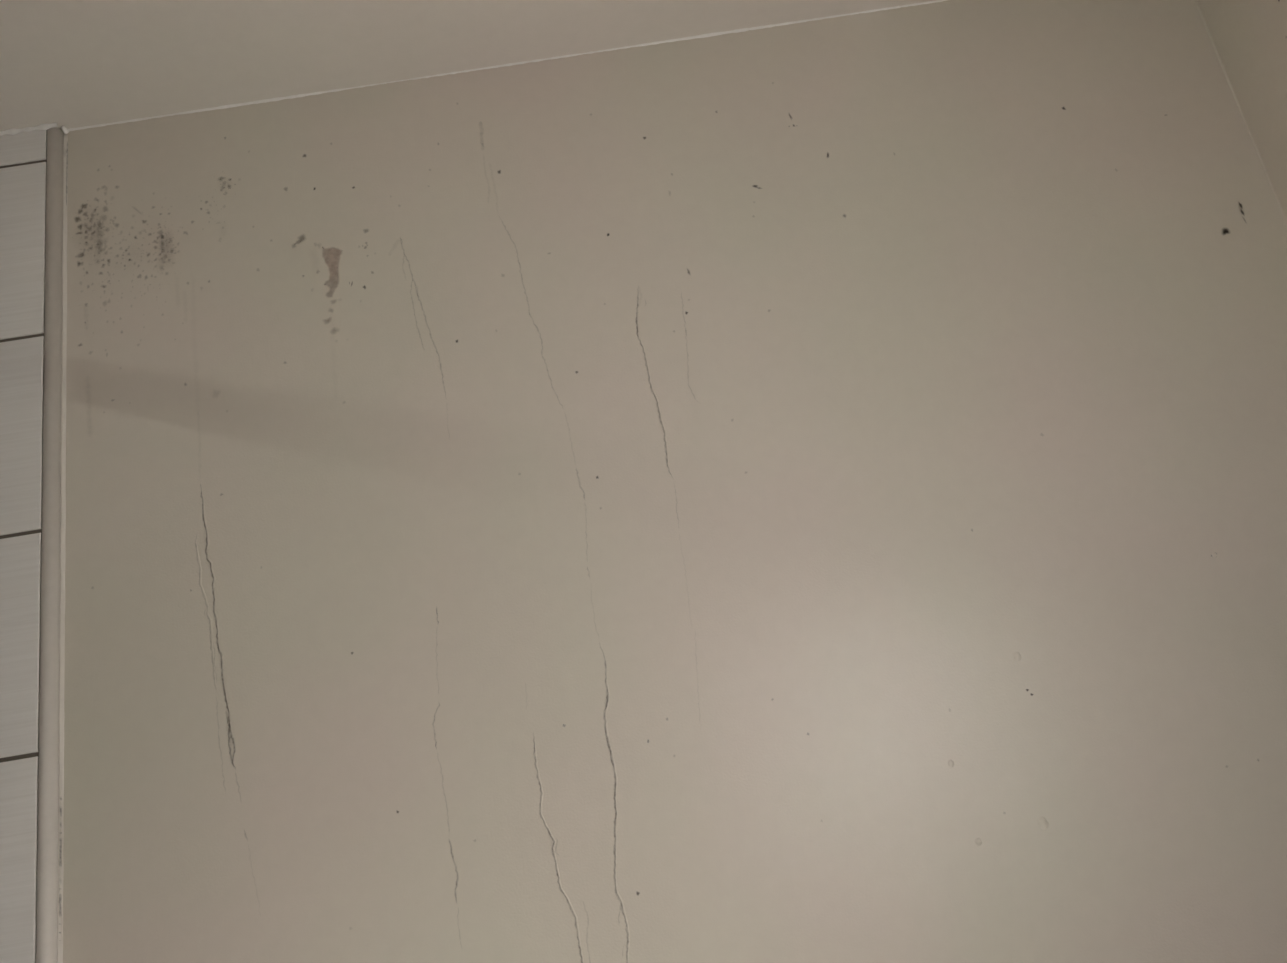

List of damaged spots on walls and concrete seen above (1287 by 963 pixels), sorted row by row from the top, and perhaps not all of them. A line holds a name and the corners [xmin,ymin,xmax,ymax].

crack [637,285,675,479]
crack [534,731,584,963]
crack [600,640,630,963]